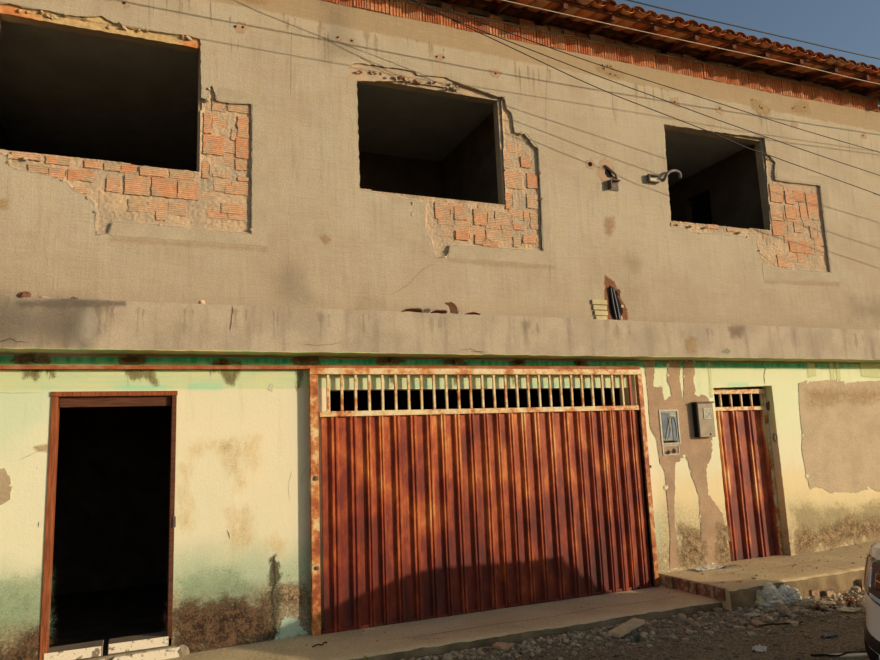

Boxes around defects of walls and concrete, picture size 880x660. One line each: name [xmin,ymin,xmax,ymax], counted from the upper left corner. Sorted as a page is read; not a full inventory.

peeling [355,70,437,85]
flaking render [0,85,253,236]
flaking render [360,96,543,258]
flaking render [670,156,831,273]
damp [0,300,125,343]
hole [591,276,628,320]
peeling [0,468,14,505]
peeling [644,360,729,569]
peeling [798,379,880,494]
damp [795,503,880,554]
damp [0,627,50,660]
damp [171,584,307,654]